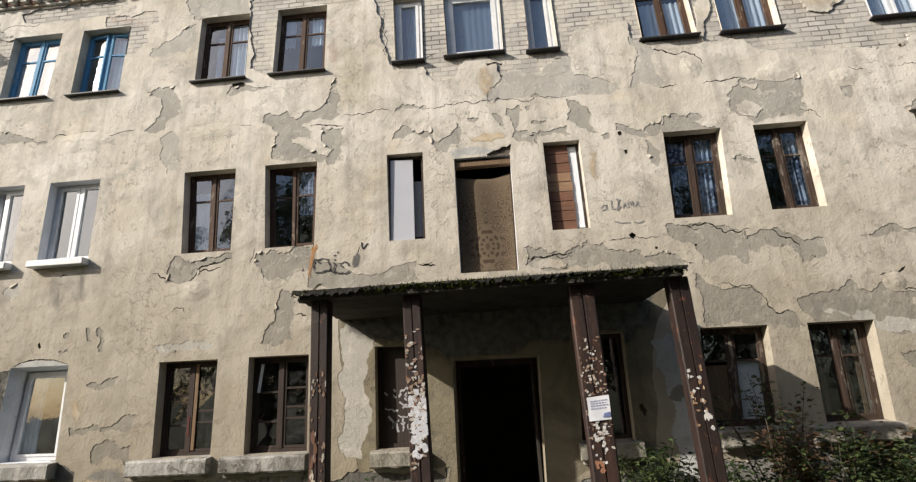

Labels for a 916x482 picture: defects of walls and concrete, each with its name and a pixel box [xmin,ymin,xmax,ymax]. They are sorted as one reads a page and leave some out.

flaking render [22,0,359,75]
peeling [145,86,182,173]
peeling [226,84,270,96]
peeling [262,78,344,165]
flaking render [374,0,916,167]
peeling [86,327,105,352]
peeling [165,252,232,284]
peeling [254,246,419,347]
peeling [524,222,916,335]
peeling [51,464,74,482]
peeling [68,414,137,466]
peeling [309,321,428,482]